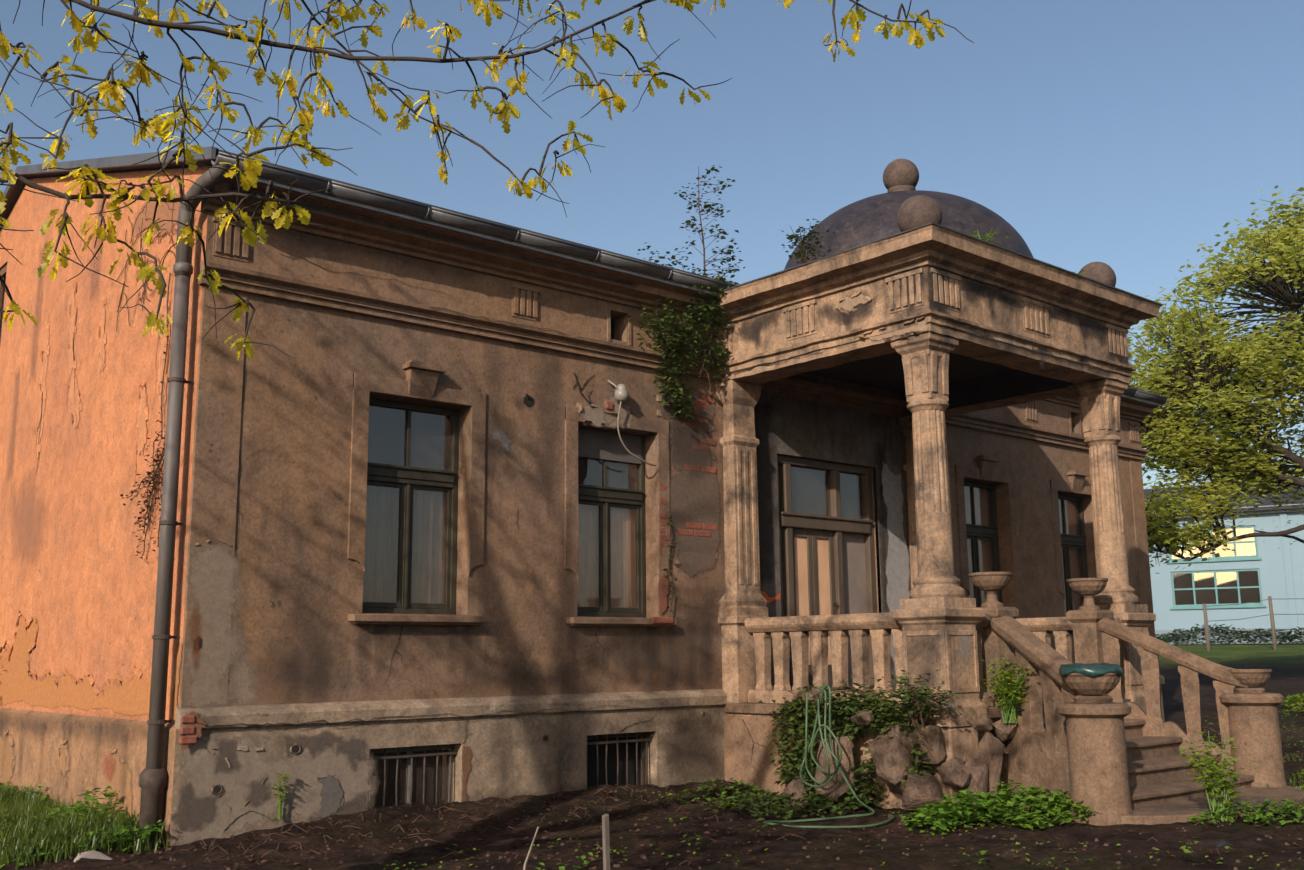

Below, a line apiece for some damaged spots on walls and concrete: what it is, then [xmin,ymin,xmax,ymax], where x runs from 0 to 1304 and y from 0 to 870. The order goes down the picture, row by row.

peeling [882,462,910,612]
peeling [0,612,152,717]
flaking render [172,538,374,846]